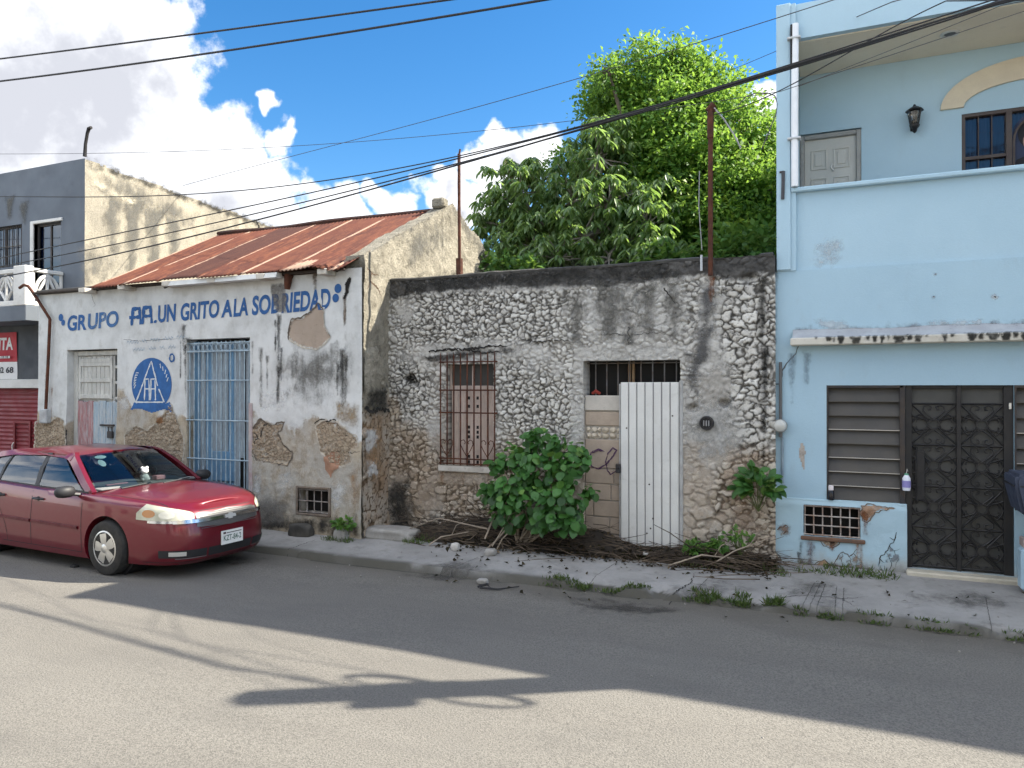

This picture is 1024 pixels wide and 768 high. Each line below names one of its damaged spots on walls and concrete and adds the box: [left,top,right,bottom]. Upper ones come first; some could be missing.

water stain [252,316,348,400]
spalling [287,303,330,350]
water stain [815,325,927,344]
water stain [967,322,1024,341]
spalling [33,417,66,448]
spalling [124,403,185,463]
spalling [252,392,293,466]
spalling [315,420,376,506]
peeling [860,503,895,526]
crack [832,532,899,570]